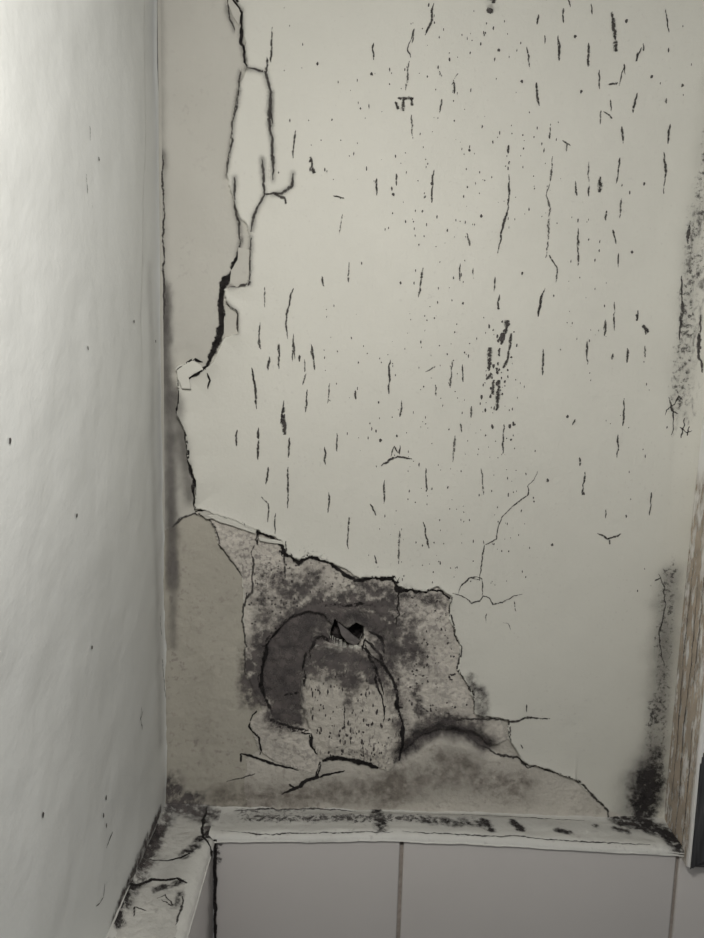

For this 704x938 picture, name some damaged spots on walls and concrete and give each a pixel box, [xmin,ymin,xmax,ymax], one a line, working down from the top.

crack [663,98,671,194]
damp [669,211,704,436]
peeling [144,0,622,863]
crack [130,0,650,924]
damp [240,567,493,761]
damp [655,564,676,662]
crack [670,556,704,839]
damp [242,773,494,832]
peeling [690,753,704,869]
peeling [114,881,185,938]